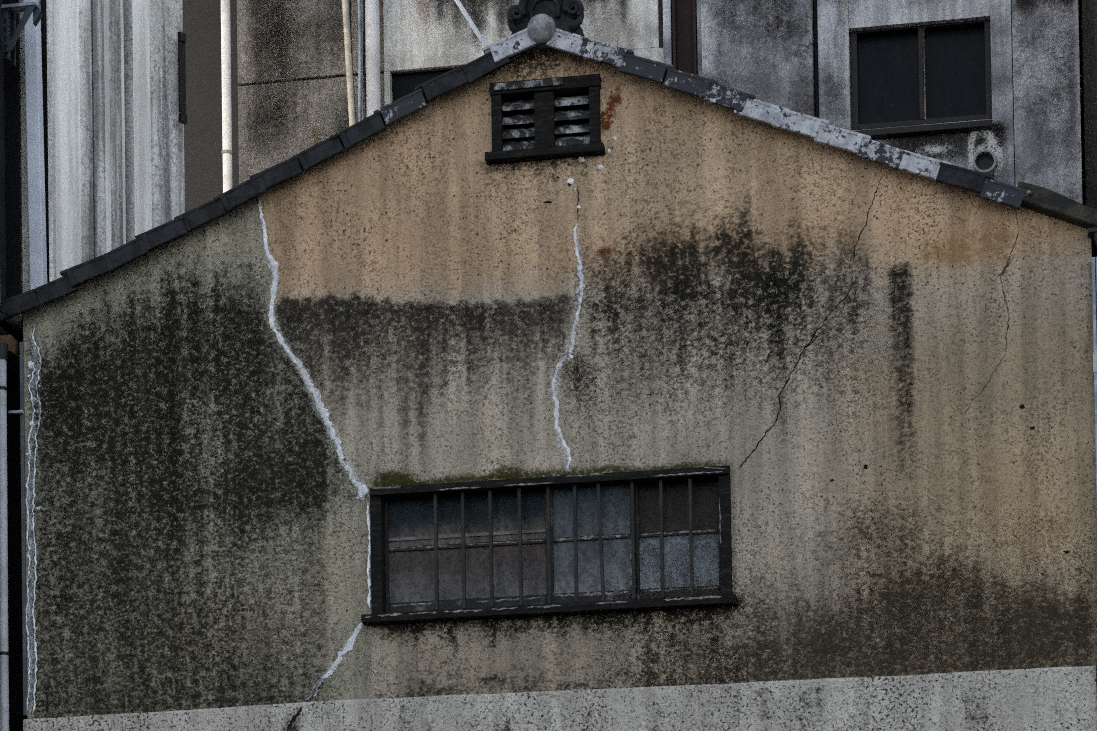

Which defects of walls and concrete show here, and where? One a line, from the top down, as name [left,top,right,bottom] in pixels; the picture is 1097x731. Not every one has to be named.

damp [437,0,513,38]
rust [600,86,621,130]
damp [767,9,800,38]
damp [889,122,1004,159]
crack [25,327,45,714]
crack [256,197,371,702]
damp [31,202,870,731]
crack [551,186,585,469]
damp [374,517,1092,730]
crack [739,176,882,469]
damp [889,262,914,461]